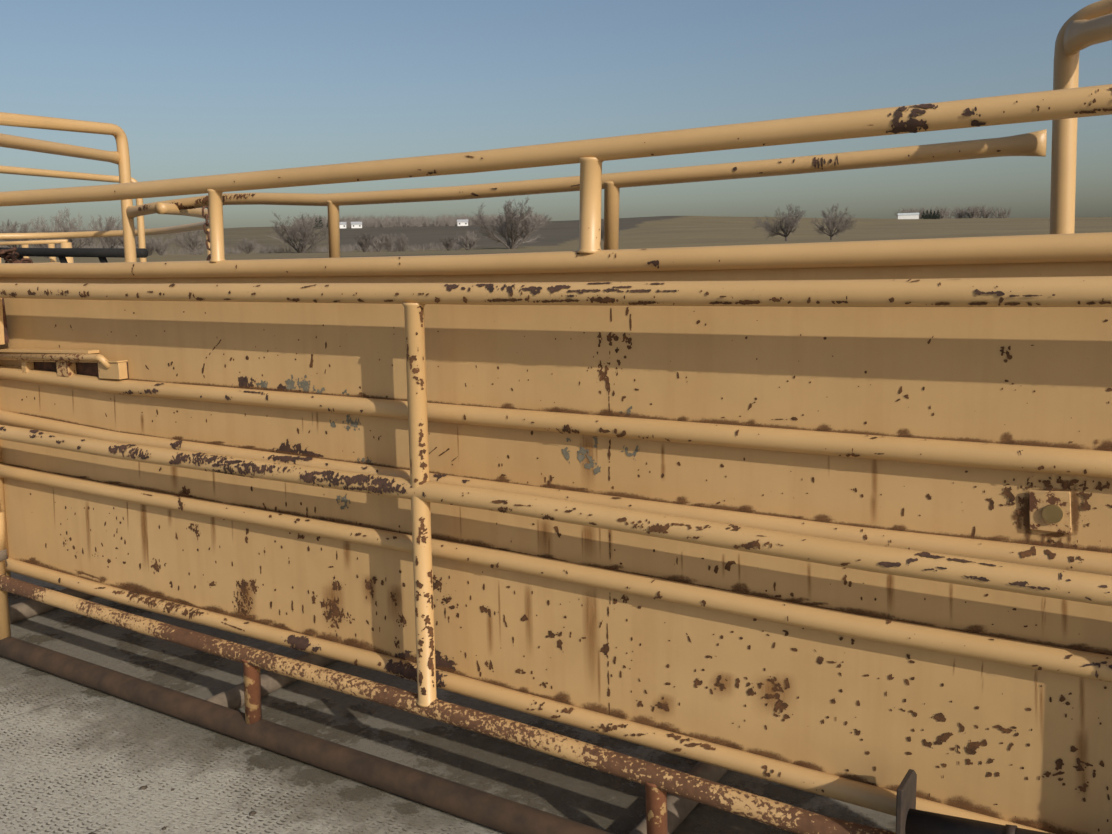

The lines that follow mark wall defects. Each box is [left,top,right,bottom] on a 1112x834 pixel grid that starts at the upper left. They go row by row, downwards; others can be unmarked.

peeling [886,104,938,134]
peeling [413,282,679,303]
peeling [159,428,426,497]
rust [18,413,1112,553]
peeling [232,532,412,659]
rust [4,463,823,777]
rust [584,564,1112,656]
peeling [878,548,1002,597]
peeling [694,631,799,730]
rust [838,773,898,792]
peeling [864,674,1104,802]
rust [916,791,1078,834]